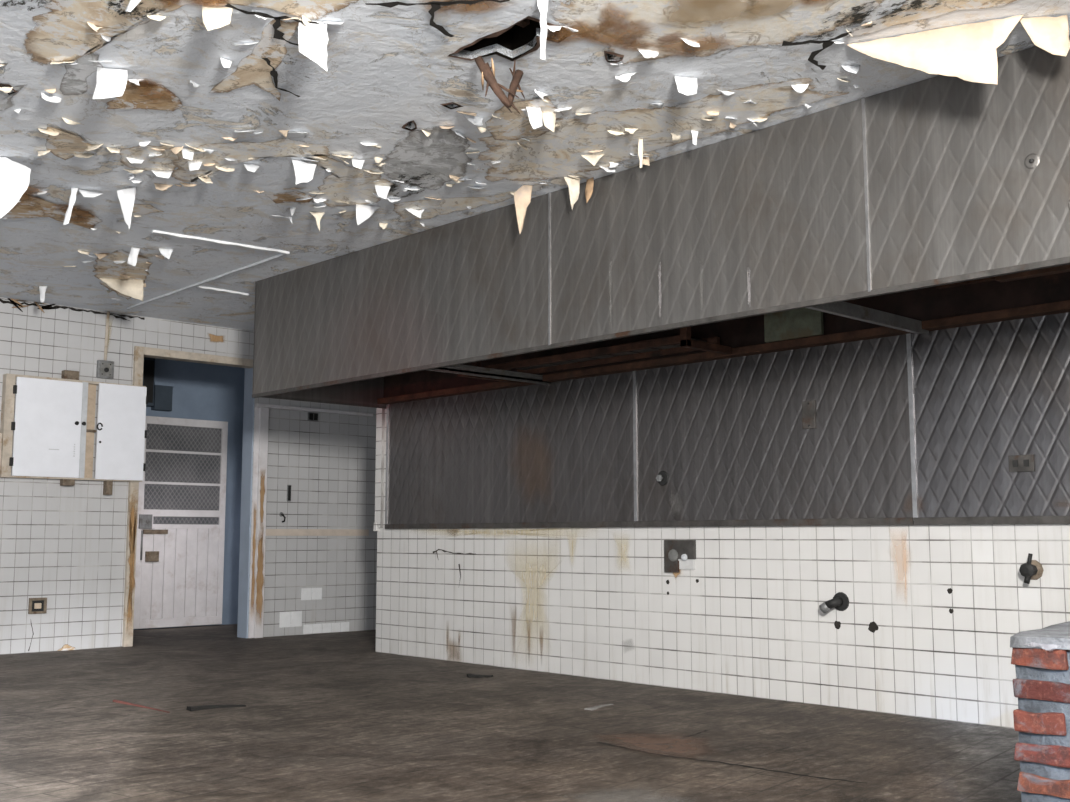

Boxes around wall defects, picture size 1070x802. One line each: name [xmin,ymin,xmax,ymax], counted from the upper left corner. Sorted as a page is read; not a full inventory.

water stain [108,0,160,21]
water stain [670,0,793,22]
water stain [791,0,940,44]
peeling [0,85,26,114]
peeling [24,0,1070,234]
peeling [0,157,102,230]
peeling [62,247,173,301]
spalling [8,286,58,313]
crack [0,299,145,321]
corrosion [251,474,265,618]